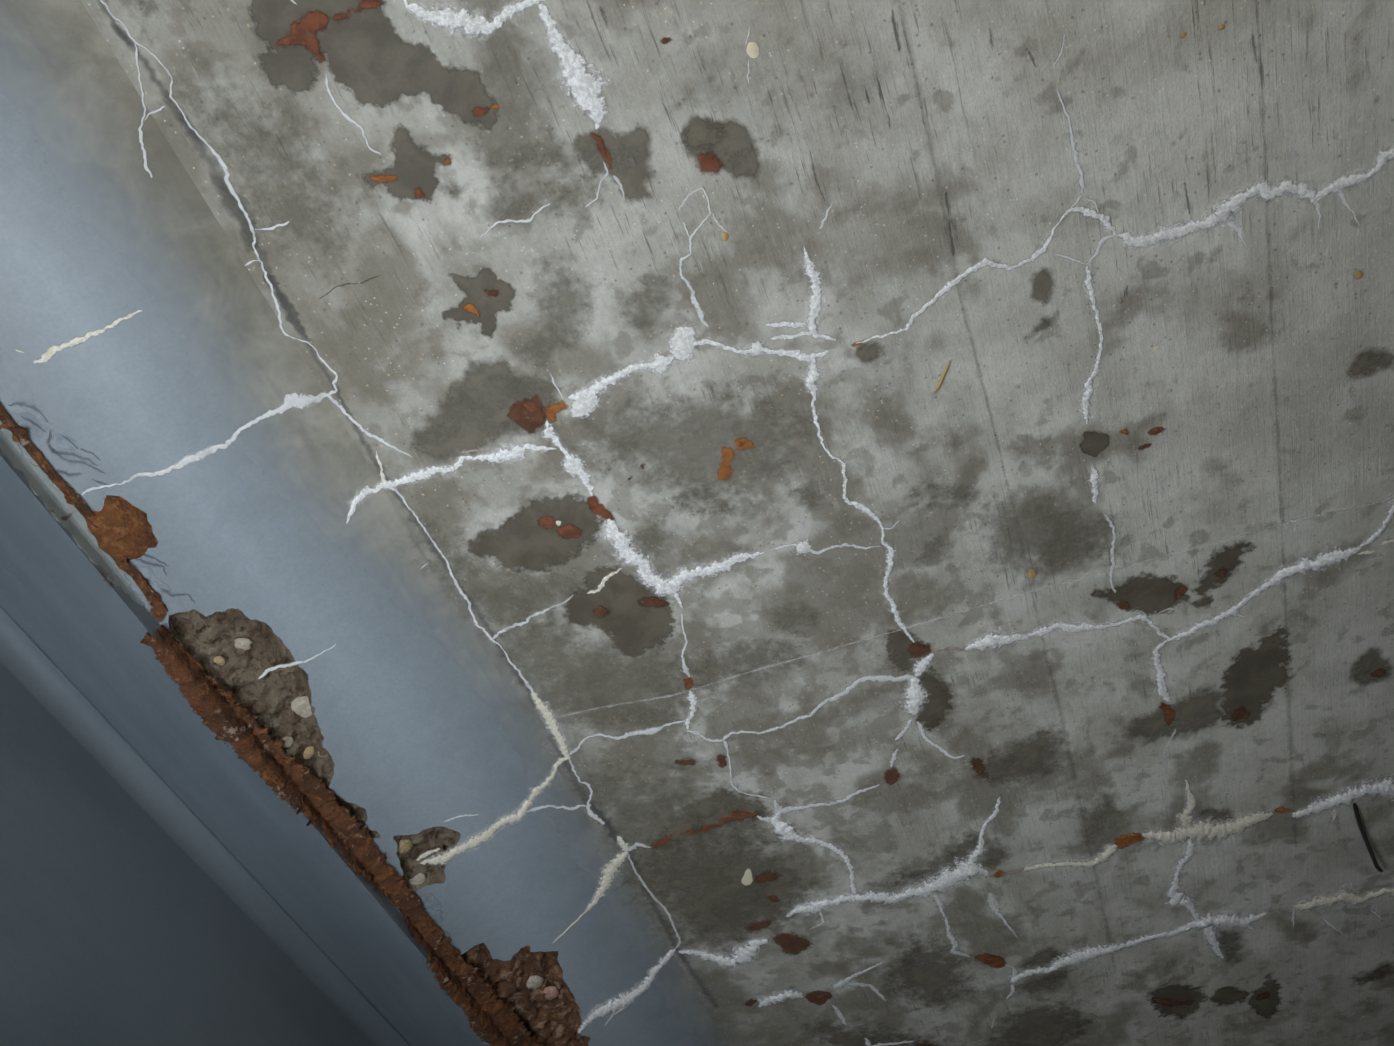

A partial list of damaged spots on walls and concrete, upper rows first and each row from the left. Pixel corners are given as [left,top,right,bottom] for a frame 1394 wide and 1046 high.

crack [82,0,412,495]
leakage [251,0,499,129]
leakage [363,126,451,200]
leakage [442,268,515,338]
crack [403,0,625,207]
spalling [9,403,461,937]
rust [0,404,542,1046]
leakage [434,495,686,723]
crack [346,187,1394,999]
leakage [1091,542,1254,615]
spalling [461,943,591,1046]
crack [553,836,768,1033]